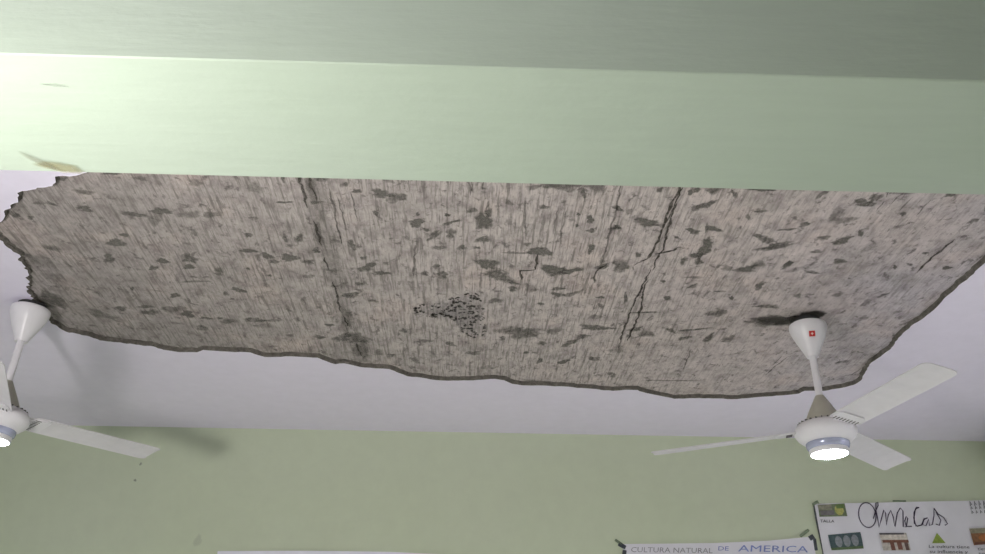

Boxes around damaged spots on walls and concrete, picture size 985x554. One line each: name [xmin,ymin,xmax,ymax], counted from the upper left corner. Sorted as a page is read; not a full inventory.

damp [41,163,79,173]
crack [298,177,362,356]
spalling [0,172,985,399]
crack [593,191,620,283]
crack [619,187,686,344]